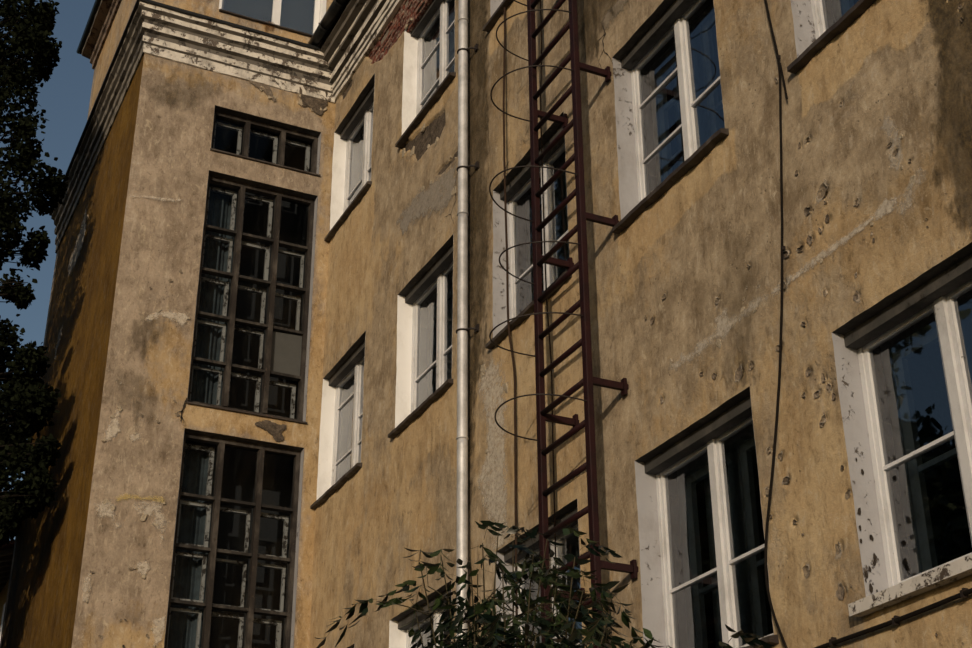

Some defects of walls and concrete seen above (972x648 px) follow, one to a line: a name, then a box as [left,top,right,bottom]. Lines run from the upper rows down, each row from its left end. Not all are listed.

flaking render [369,0,433,64]
spalling [249,75,276,102]
spalling [298,87,328,116]
spalling [402,112,446,160]
leakage [929,0,972,226]
spalling [783,182,830,258]
spalling [255,420,287,442]
peeling [864,553,878,594]